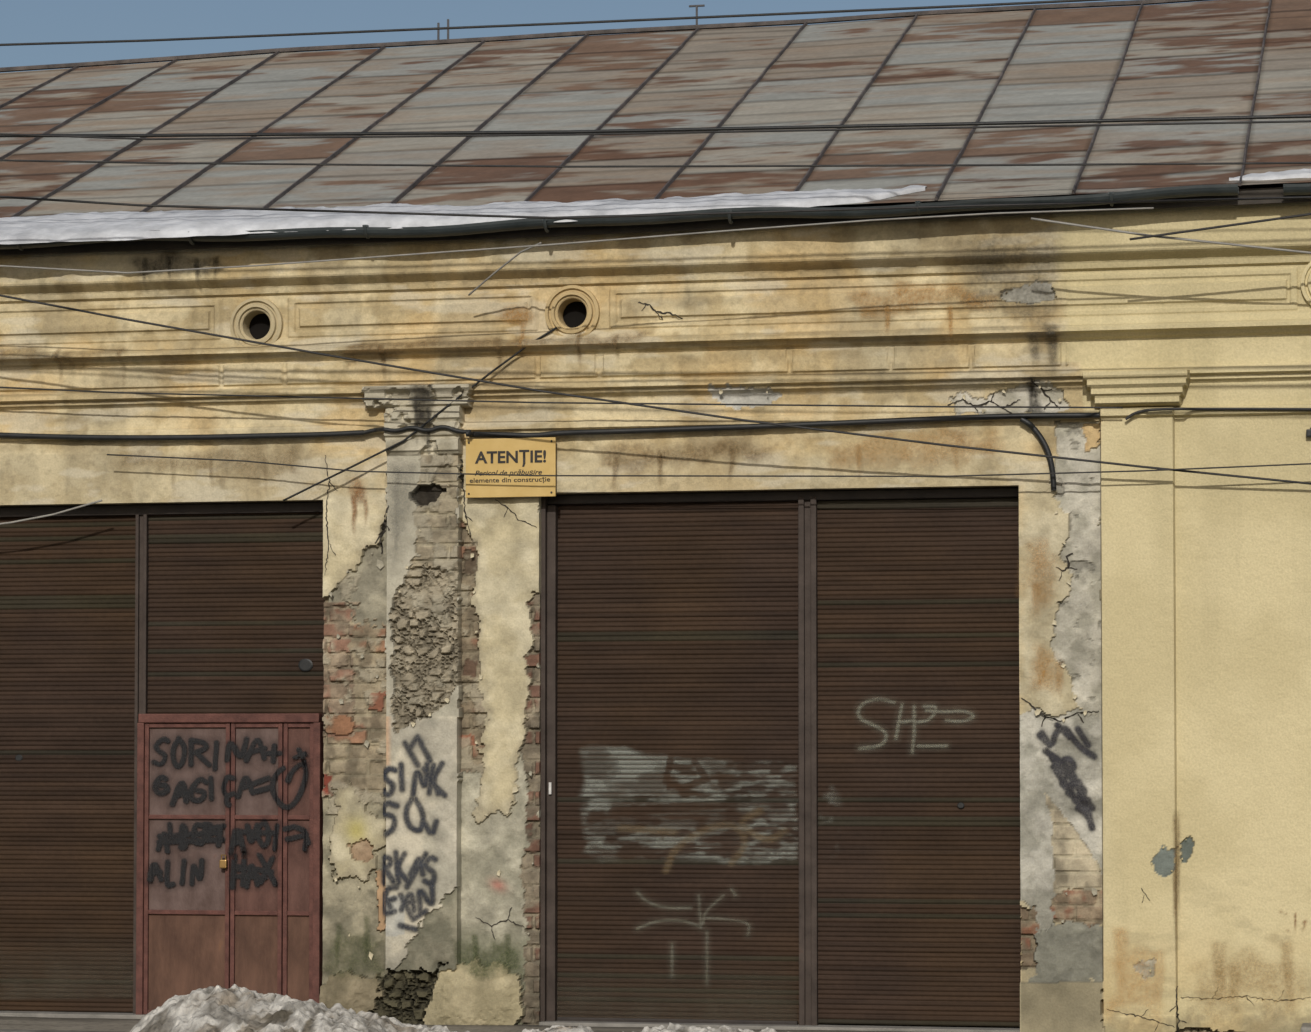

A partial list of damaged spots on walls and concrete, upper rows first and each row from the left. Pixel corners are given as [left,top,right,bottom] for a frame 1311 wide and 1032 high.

peeling [1001,279,1057,304]
crack [948,380,1060,413]
flaking render [950,379,1103,969]
spalling [322,453,540,1025]
peeling [1151,835,1195,876]
crack [1107,986,1309,1032]